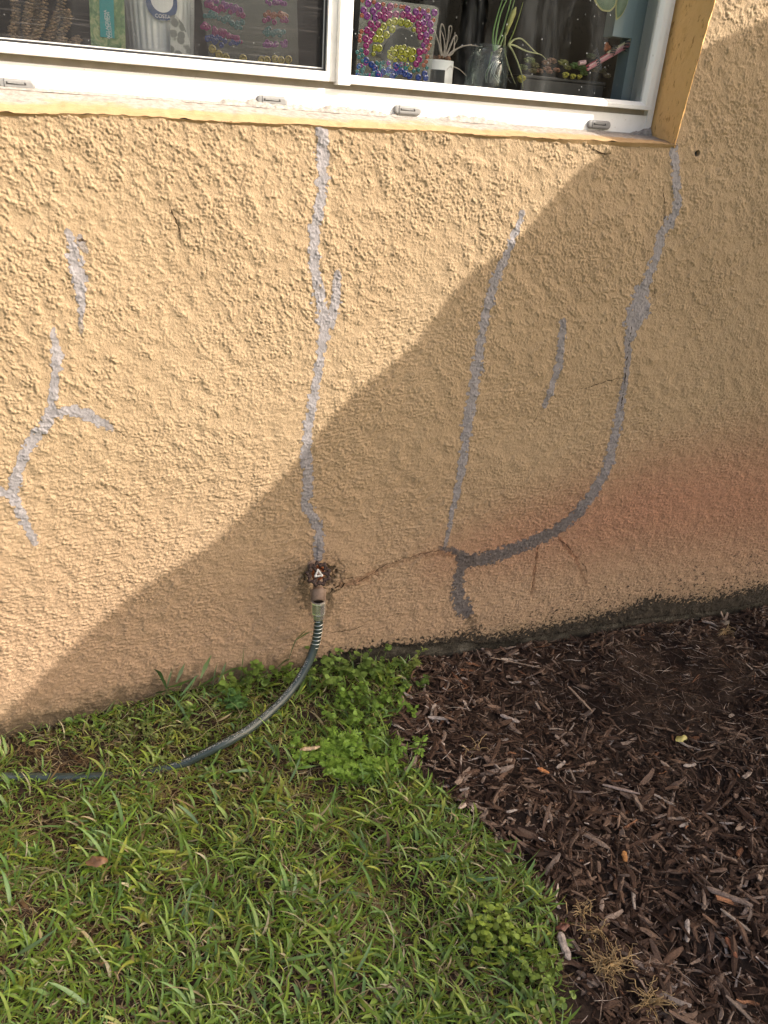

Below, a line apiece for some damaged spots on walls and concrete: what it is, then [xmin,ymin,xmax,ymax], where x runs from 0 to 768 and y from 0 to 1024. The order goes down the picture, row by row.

crack [0,228,126,546]
crack [299,127,343,562]
crack [354,141,682,620]
water stain [319,551,768,659]